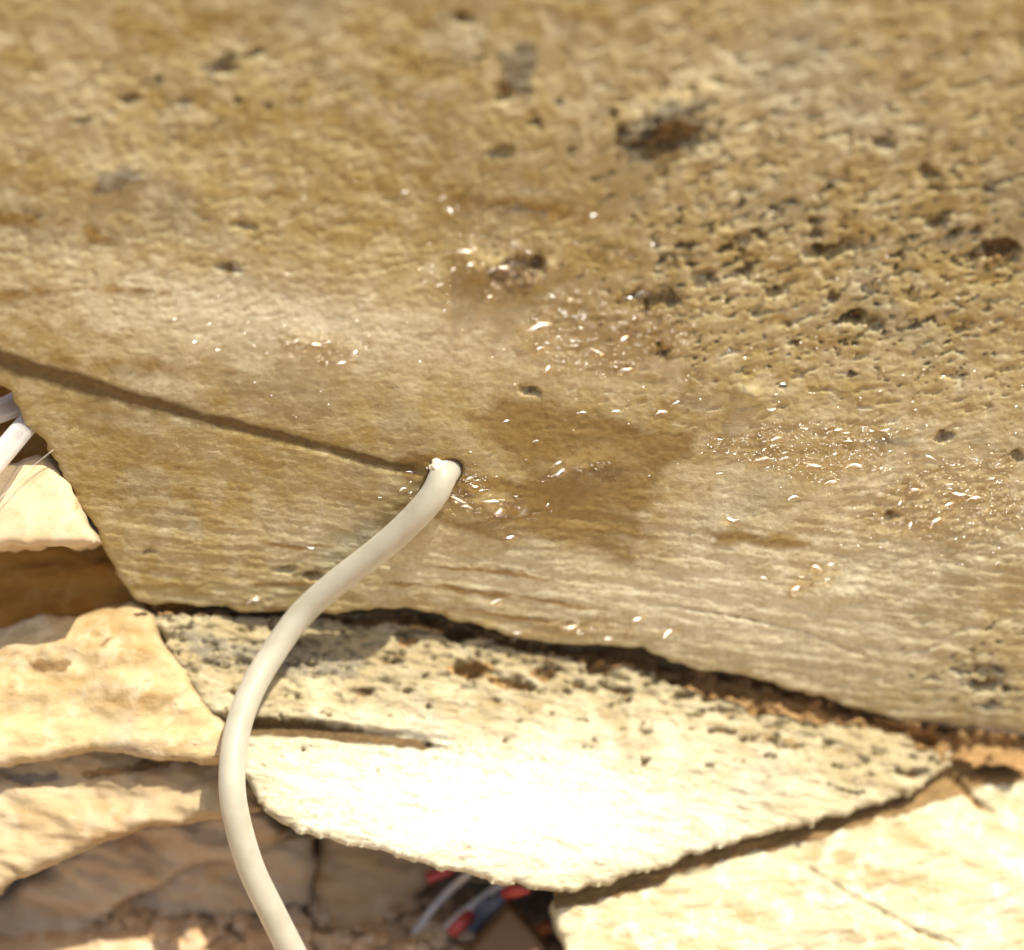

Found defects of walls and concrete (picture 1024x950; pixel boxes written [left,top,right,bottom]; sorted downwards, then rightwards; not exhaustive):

crack [0,352,414,472]
leakage [400,401,693,547]